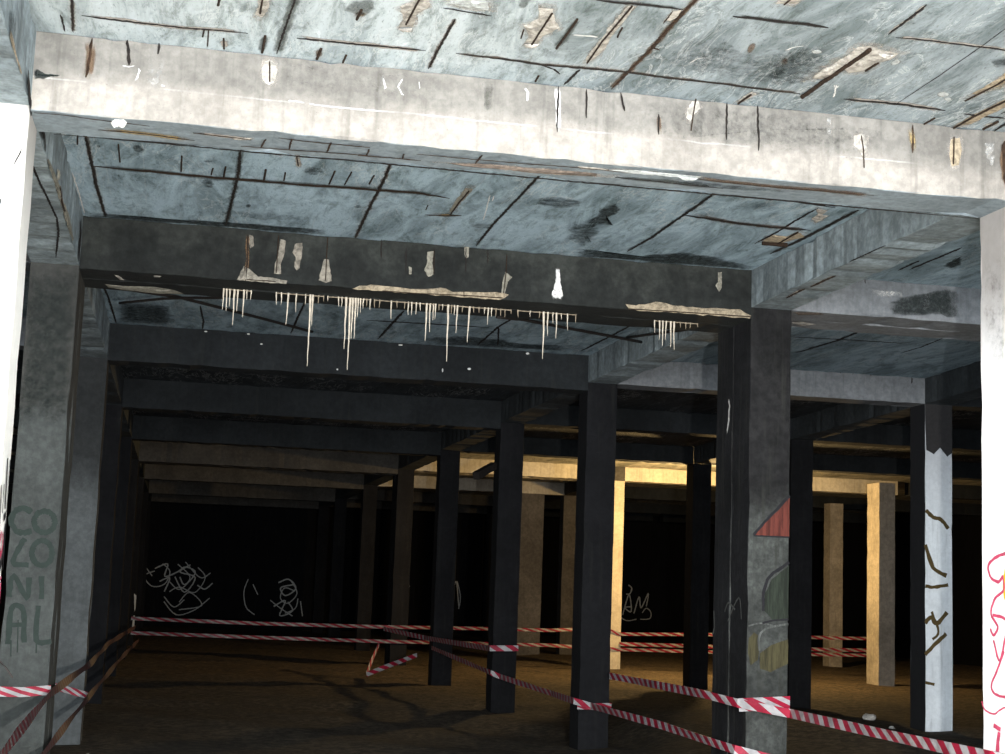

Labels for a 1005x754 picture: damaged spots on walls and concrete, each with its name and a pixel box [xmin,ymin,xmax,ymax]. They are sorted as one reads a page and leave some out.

spalling [399,0,430,32]
peeling [446,0,489,10]
spalling [520,8,578,50]
spalling [800,45,900,99]
spalling [964,73,1005,102]
spalling [424,250,435,277]
spalling [353,256,512,300]
damp [552,270,563,298]
spalling [626,302,751,318]
damp [276,292,577,370]
damp [654,320,698,347]